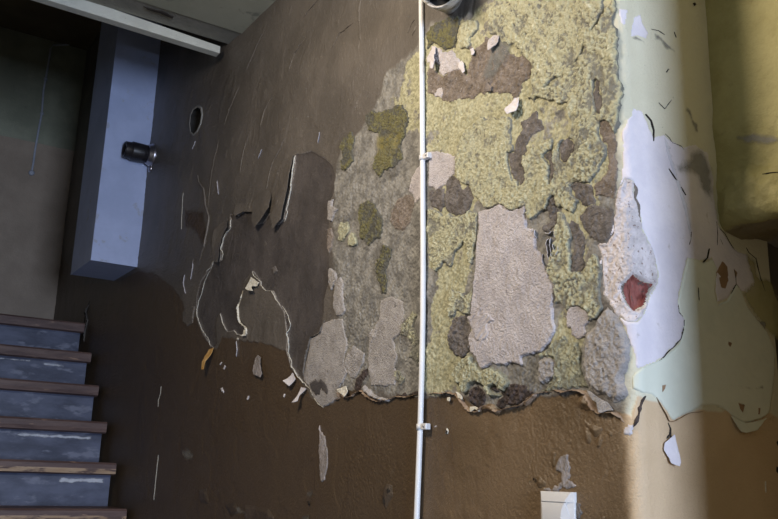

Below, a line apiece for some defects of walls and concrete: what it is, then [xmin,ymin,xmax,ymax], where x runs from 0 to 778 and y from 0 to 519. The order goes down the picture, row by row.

peeling [619,9,648,38]
flaking render [427,35,532,114]
flaking render [508,111,544,185]
flaking render [545,138,575,181]
crack [197,175,210,259]
flaking render [429,176,474,216]
flaking render [534,197,558,265]
peeling [569,80,755,368]
peeling [196,151,368,408]
flaking render [447,315,471,358]
flaking render [447,384,533,412]
peeling [587,390,613,413]